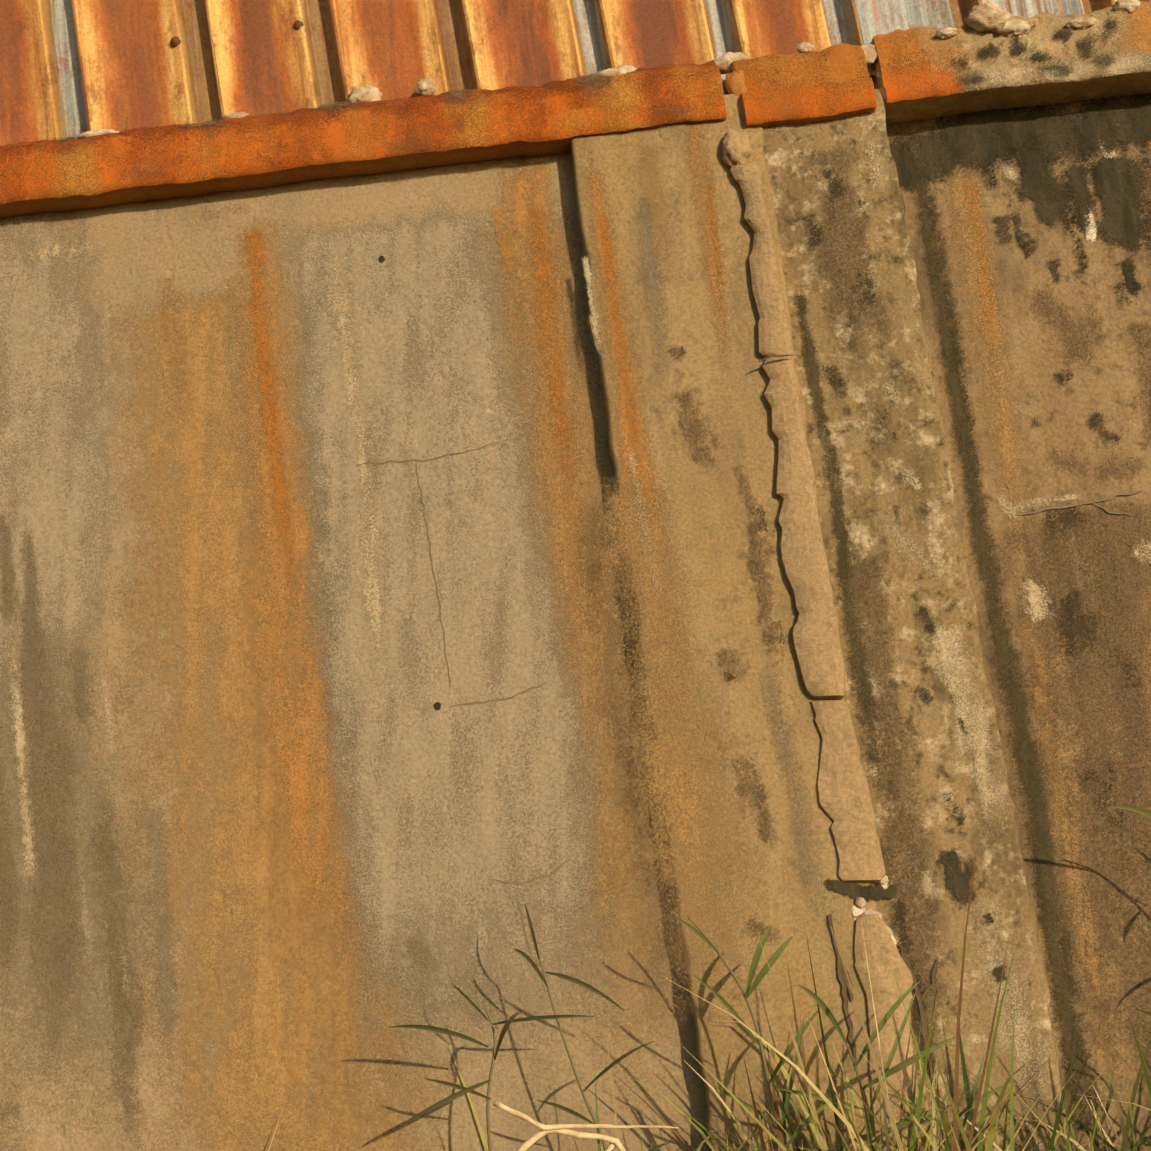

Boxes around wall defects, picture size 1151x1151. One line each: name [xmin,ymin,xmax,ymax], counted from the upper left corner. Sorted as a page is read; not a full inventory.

rust [0,60,727,204]
rust [732,25,971,125]
rust [1112,1,1151,58]
leakage [801,148,892,337]
rust [116,221,449,1151]
crack [355,443,545,707]
leakage [733,466,785,654]
leakage [794,285,946,1075]
leakage [888,93,1151,1136]
leakage [0,515,174,1151]
crack [494,859,570,966]
spalling [825,878,900,920]